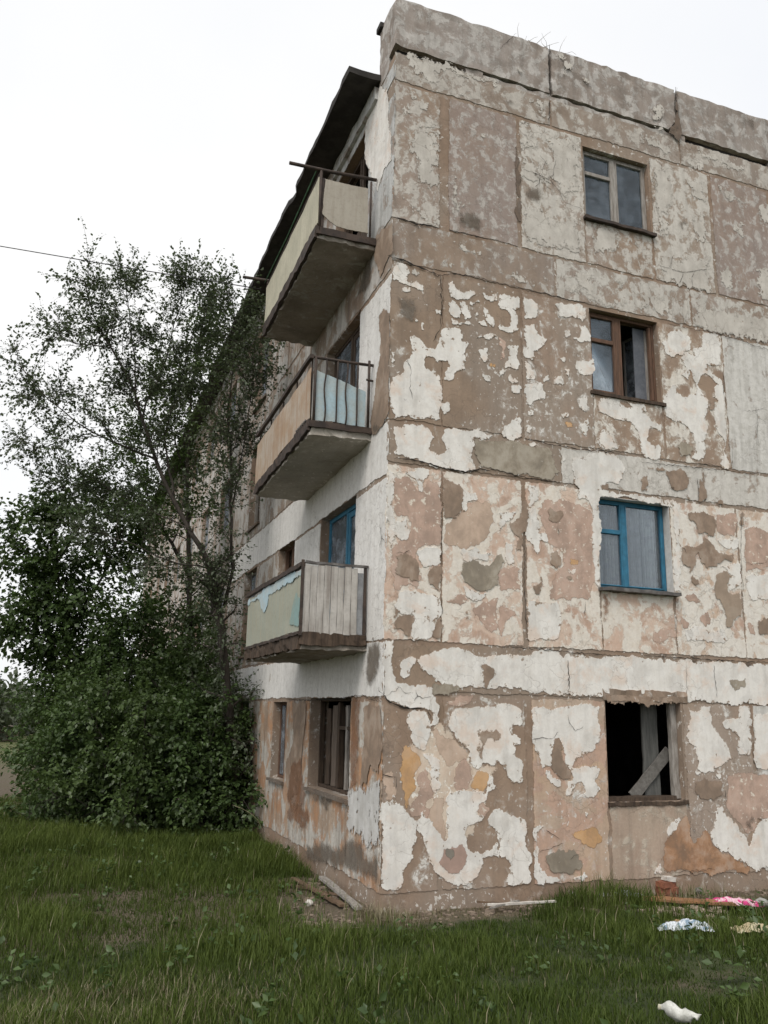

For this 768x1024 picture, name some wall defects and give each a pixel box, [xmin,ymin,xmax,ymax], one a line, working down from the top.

peeling [405,52,497,88]
crack [545,45,553,119]
peeling [364,86,441,226]
peeling [652,169,675,235]
peeling [687,149,744,243]
peeling [759,203,768,224]
spalling [374,223,424,292]
peeling [346,255,768,891]
water stain [306,839,377,880]